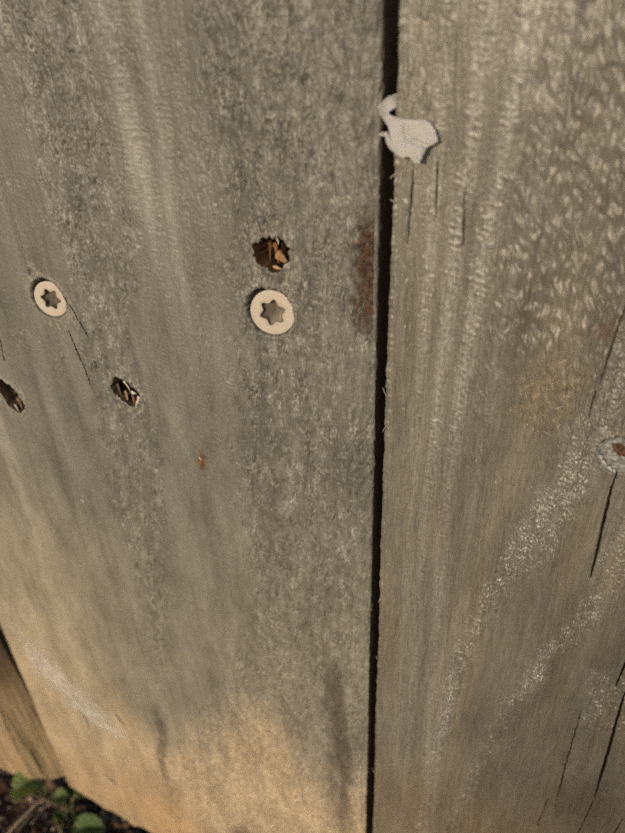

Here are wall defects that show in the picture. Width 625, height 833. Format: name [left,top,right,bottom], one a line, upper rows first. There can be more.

rust [354,226,375,327]
crack [588,309,625,418]
rust [596,437,625,472]
crack [590,473,617,578]
crack [537,713,581,826]
crack [578,662,625,833]